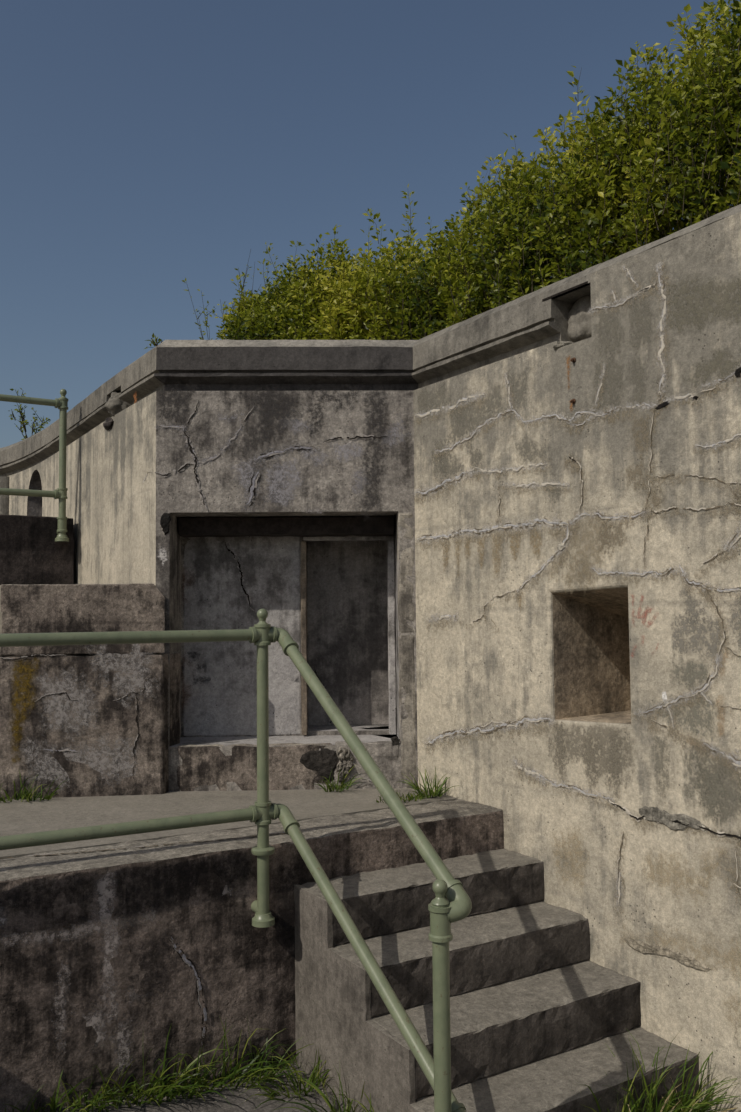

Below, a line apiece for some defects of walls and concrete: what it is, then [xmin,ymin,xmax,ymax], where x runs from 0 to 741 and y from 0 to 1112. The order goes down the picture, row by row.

crack [143,400,388,511]
leakage [238,388,408,513]
crack [414,263,741,780]
leakage [40,672,93,732]
leakage [12,717,136,784]
leakage [95,644,152,705]
crack [0,832,285,859]
spalling [300,747,354,782]
crack [424,716,741,913]
leakage [0,860,255,1071]